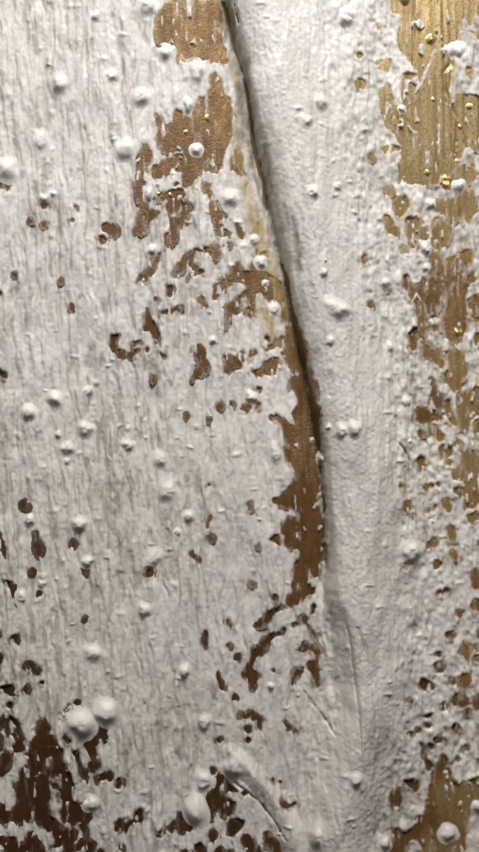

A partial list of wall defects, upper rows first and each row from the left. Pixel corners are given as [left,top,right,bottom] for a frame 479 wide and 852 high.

peeling [109,308,160,361]
peeling [132,74,244,314]
peeling [153,0,227,64]
peeling [189,343,211,384]
crack [222,1,273,211]
peeling [197,251,324,693]
crack [275,244,327,539]
peeling [367,0,479,525]
peeling [0,660,126,852]
peeling [180,767,283,852]
peeling [216,671,264,743]
peeling [387,736,479,852]